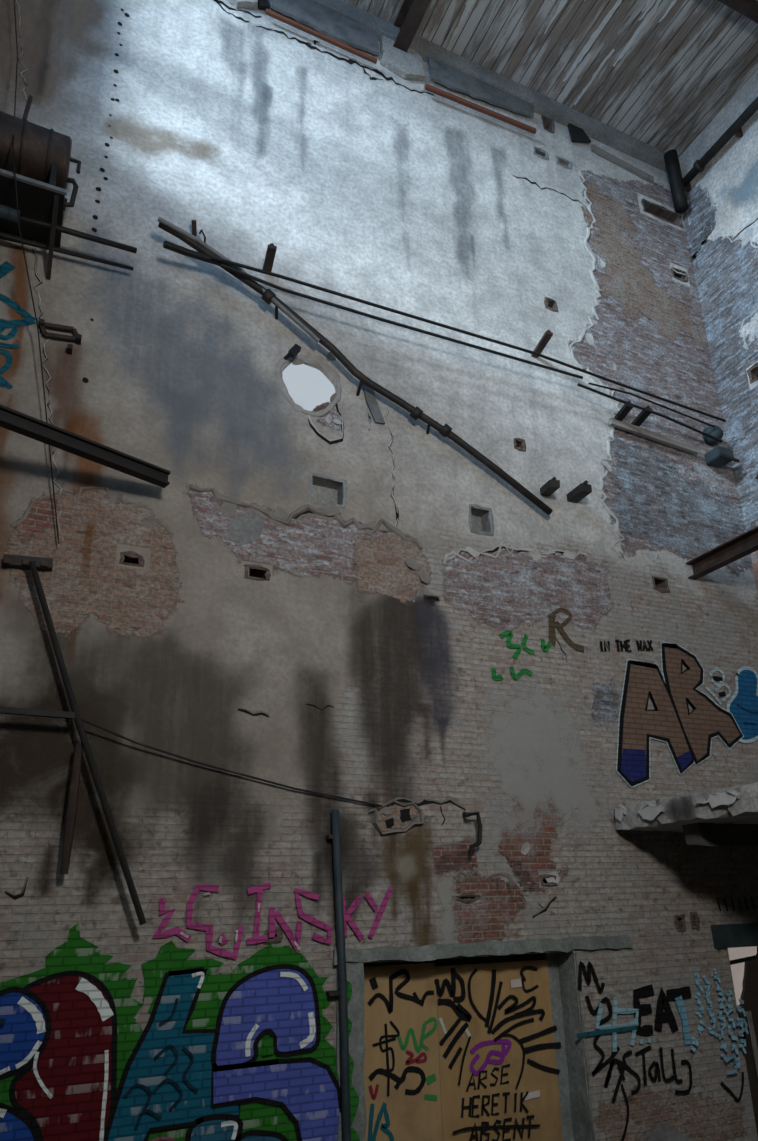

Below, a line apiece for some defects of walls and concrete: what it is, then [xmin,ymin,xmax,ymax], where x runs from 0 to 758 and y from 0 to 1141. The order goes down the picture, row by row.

peeling [557,0,677,105]
crack [715,217,758,256]
spalling [274,352,343,430]
spalling [513,438,526,452]
spalling [533,147,758,561]
spalling [3,471,185,640]
spalling [185,472,615,632]
damp [0,632,257,902]
damp [303,683,371,890]
damp [353,595,450,805]
damp [384,826,429,917]
spalling [431,796,569,943]